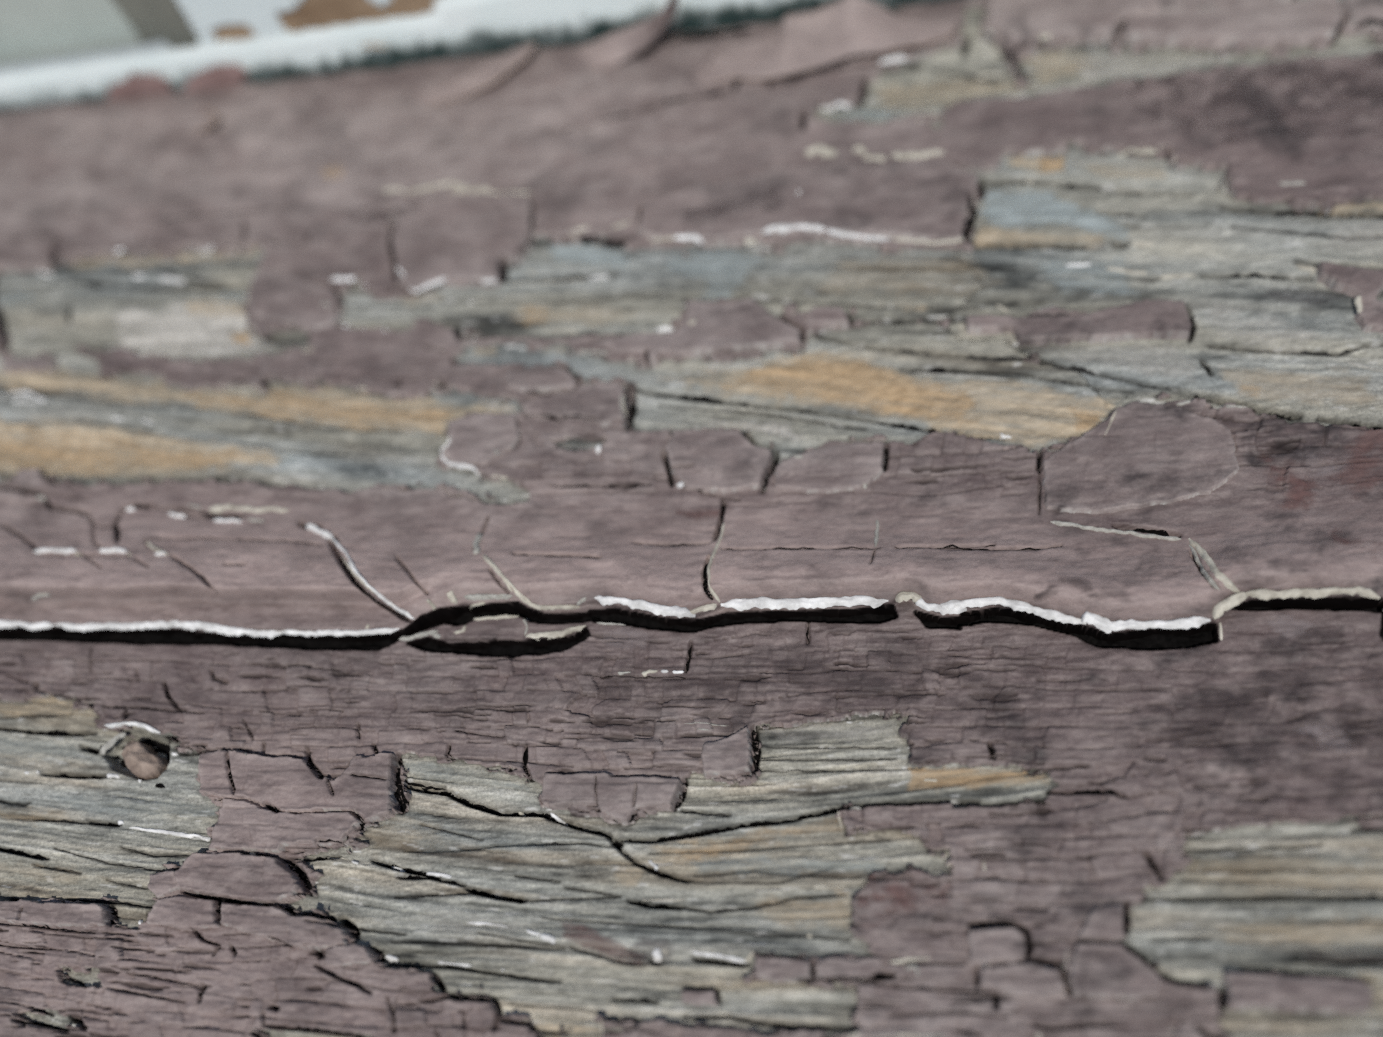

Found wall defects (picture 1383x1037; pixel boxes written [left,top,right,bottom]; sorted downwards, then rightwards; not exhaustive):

peeling [0,142,1383,514]
crack [0,487,321,591]
crack [552,481,651,489]
crack [698,489,1062,551]
crack [685,642,693,672]
crack [103,670,266,756]
crack [447,730,533,781]
crack [987,744,995,760]
crack [1057,788,1125,799]
peeling [0,696,1383,1037]
crack [110,929,237,1003]
crack [316,952,559,1036]